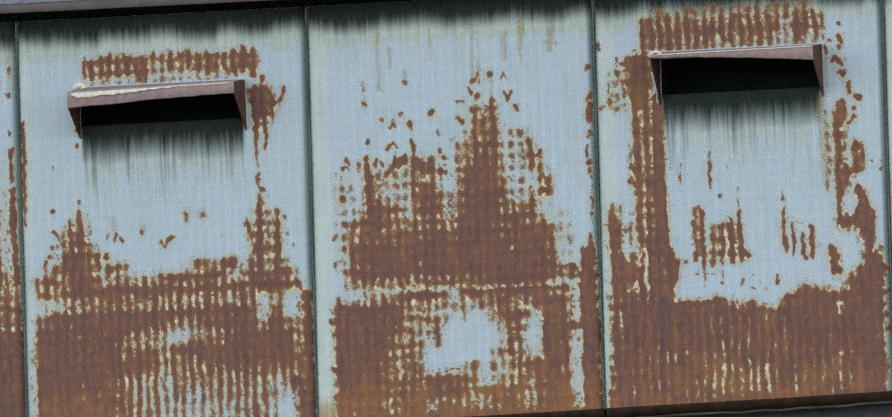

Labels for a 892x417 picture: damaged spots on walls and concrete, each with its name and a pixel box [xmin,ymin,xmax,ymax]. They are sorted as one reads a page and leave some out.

corrosion [0,44,316,417]
corrosion [329,0,892,417]